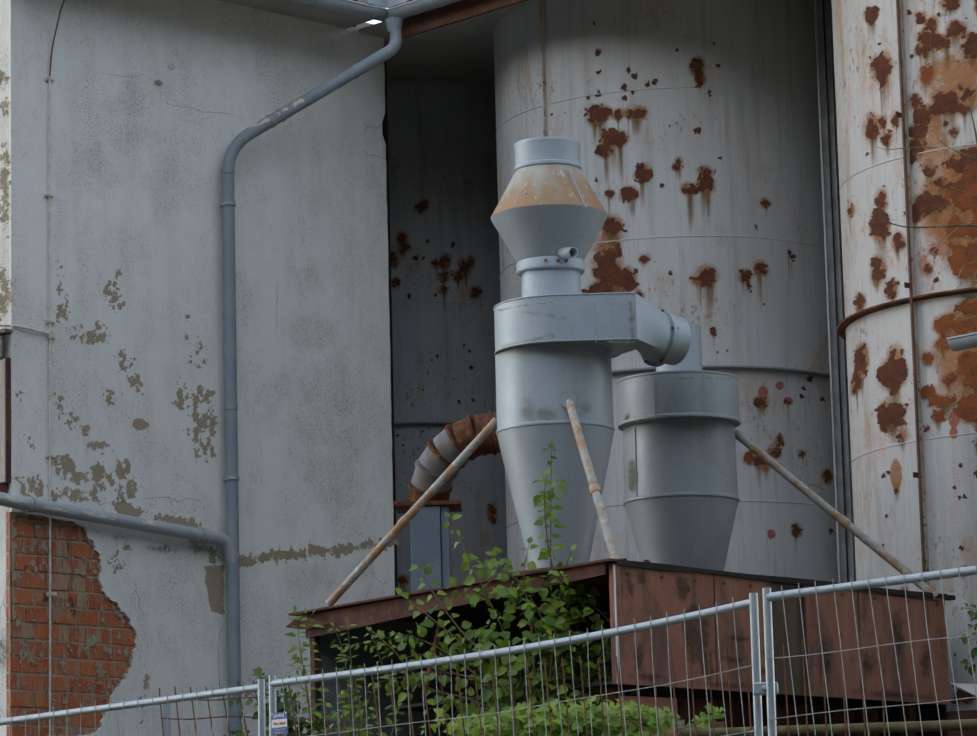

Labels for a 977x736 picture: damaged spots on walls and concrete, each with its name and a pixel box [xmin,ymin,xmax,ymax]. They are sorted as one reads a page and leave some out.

rust [604,162,665,206]
rust [681,157,722,206]
peeling [54,259,111,345]
rust [581,217,655,297]
rust [689,266,716,295]
rust [851,0,977,448]
peeling [103,349,144,406]
peeling [171,381,218,463]
rust [744,430,785,470]
flaking render [0,392,202,736]
peeling [204,546,225,614]
spalling [139,674,269,736]